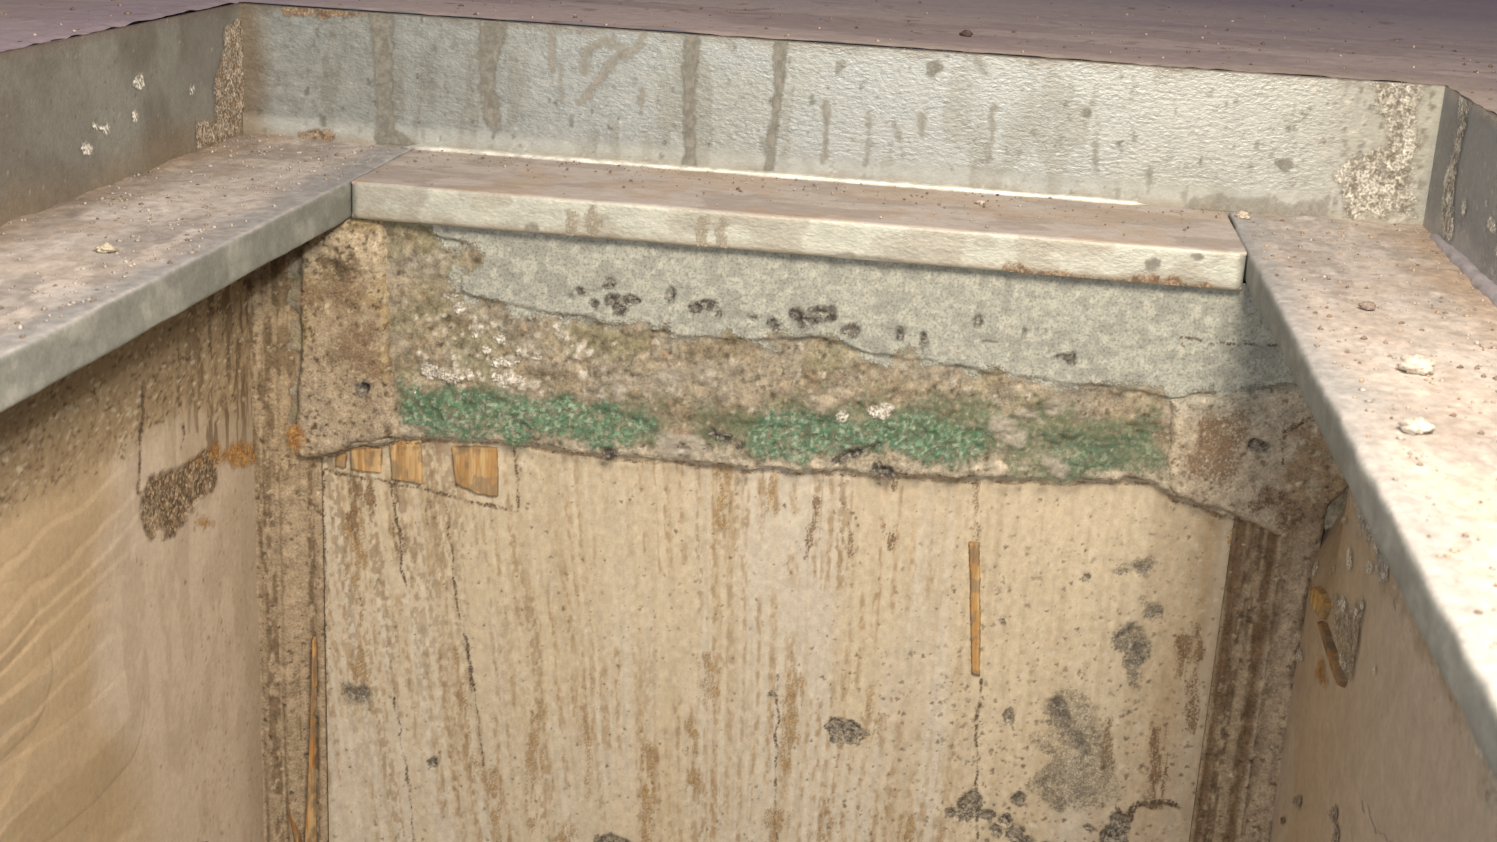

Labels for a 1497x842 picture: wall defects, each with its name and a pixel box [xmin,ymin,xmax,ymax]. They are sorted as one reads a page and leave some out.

water stain [370,13,415,146]
water stain [478,20,507,138]
water stain [548,25,645,105]
water stain [682,34,700,166]
water stain [764,41,788,171]
water stain [1190,194,1328,216]
peeling [425,224,1297,404]
spalling [602,446,618,460]
spalling [676,425,744,457]
spalling [832,442,897,480]
water stain [1175,623,1206,734]
water stain [1149,722,1168,805]